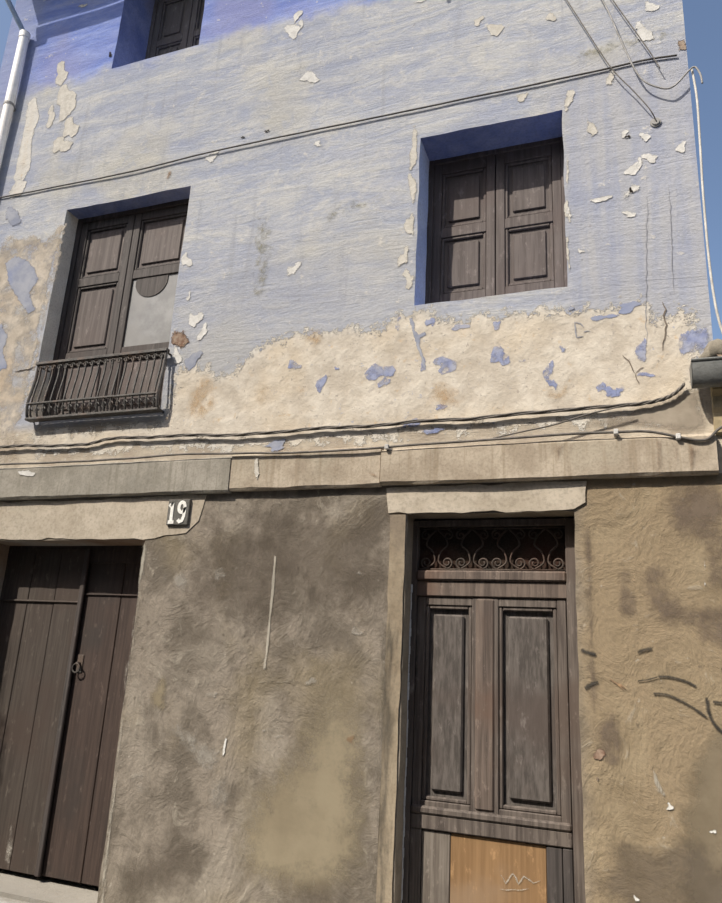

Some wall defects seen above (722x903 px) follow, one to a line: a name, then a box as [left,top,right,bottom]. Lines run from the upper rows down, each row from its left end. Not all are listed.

peeling [284,10,303,39]
peeling [635,22,653,41]
peeling [645,1,660,11]
peeling [299,70,320,83]
peeling [5,61,80,226]
peeling [622,129,650,141]
peeling [404,125,418,235]
peeling [590,153,658,203]
peeling [397,245,414,289]
peeling [0,224,66,462]
peeling [28,295,708,460]